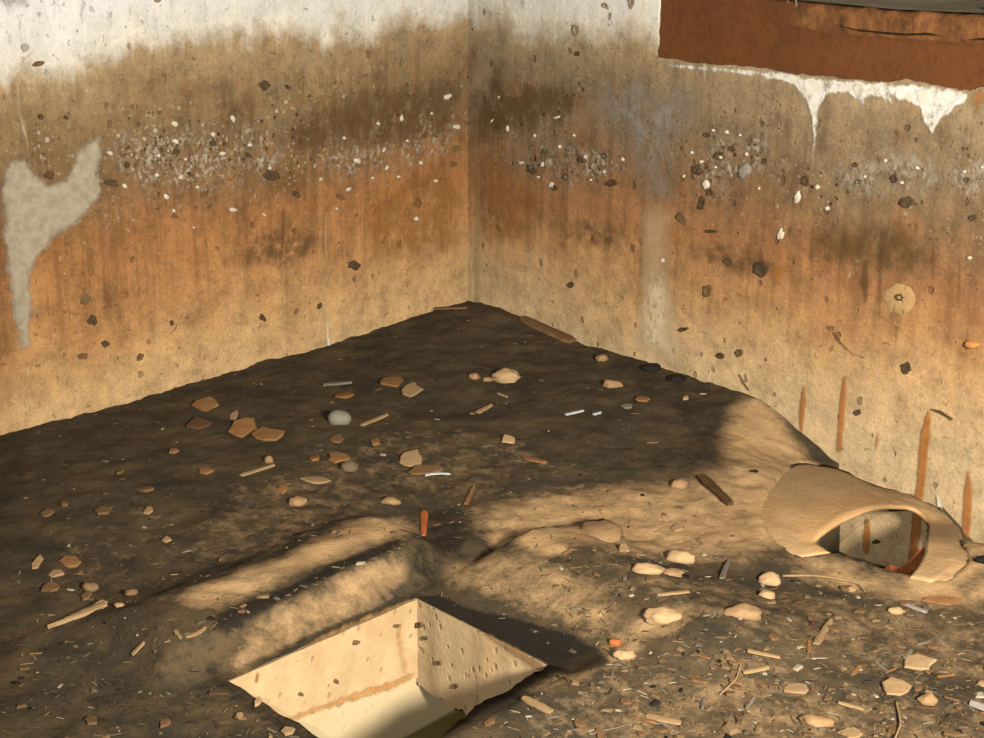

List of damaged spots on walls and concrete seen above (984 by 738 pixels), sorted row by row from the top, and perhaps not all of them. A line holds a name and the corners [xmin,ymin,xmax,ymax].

leakage [293,91,448,145]
leakage [482,83,572,132]
efflorescence [680,65,967,146]
leakage [643,216,670,352]
leakage [818,231,924,293]
corrosion [837,377,846,452]
corrosion [915,412,931,501]
corrosion [909,512,921,559]
corrosion [963,472,972,538]